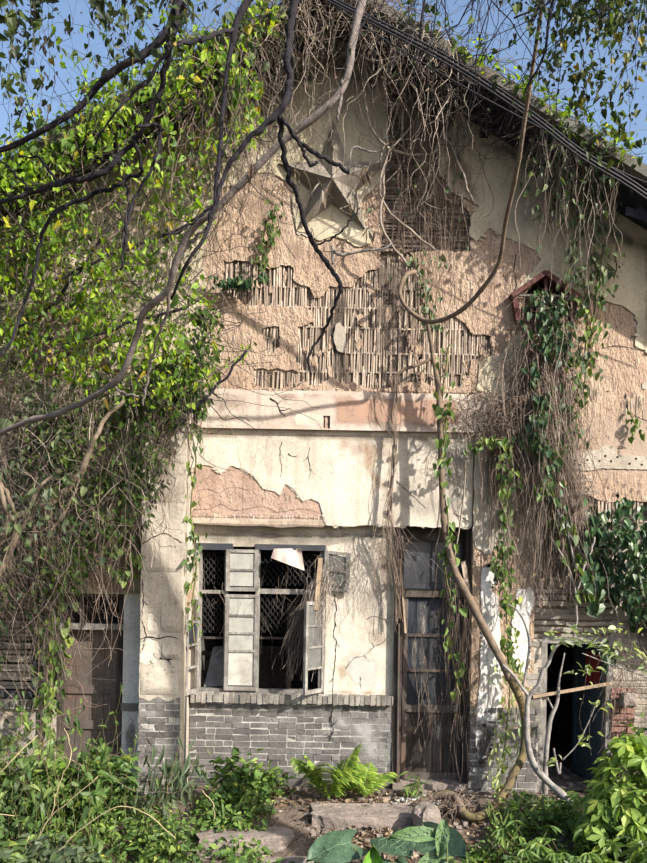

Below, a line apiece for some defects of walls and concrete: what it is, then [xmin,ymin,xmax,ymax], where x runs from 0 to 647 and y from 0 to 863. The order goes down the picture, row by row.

peeling [198,173,541,393]
peeling [560,297,647,456]
peeling [192,465,328,521]
peeling [571,468,647,503]
crack [141,579,181,665]
crack [326,594,394,741]
peeling [475,563,535,759]